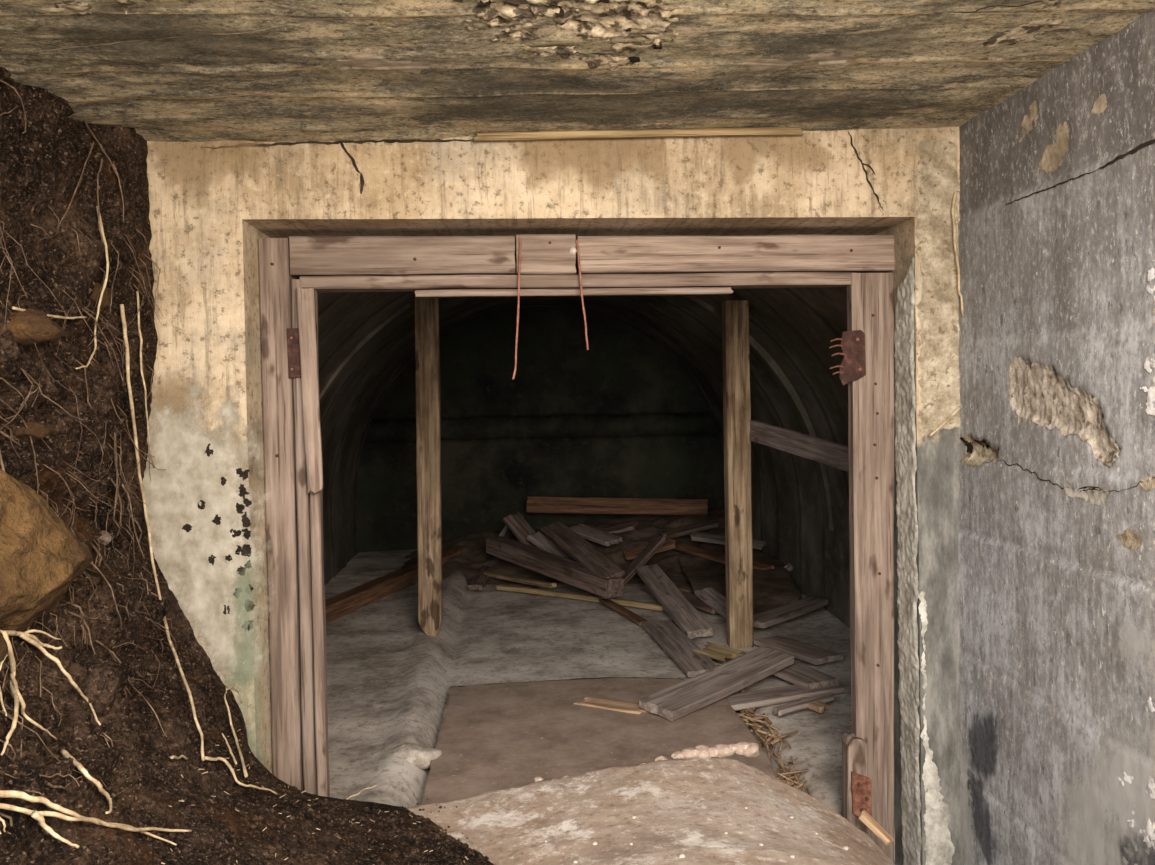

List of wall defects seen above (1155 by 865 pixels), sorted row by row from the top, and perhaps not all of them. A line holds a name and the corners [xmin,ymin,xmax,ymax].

spalling [453,0,679,71]
crack [200,139,473,194]
crack [848,132,883,210]
crack [1005,139,1155,205]
peeling [1146,260,1155,323]
peeling [1140,357,1155,415]
crack [999,460,1155,494]
water stain [143,383,262,676]